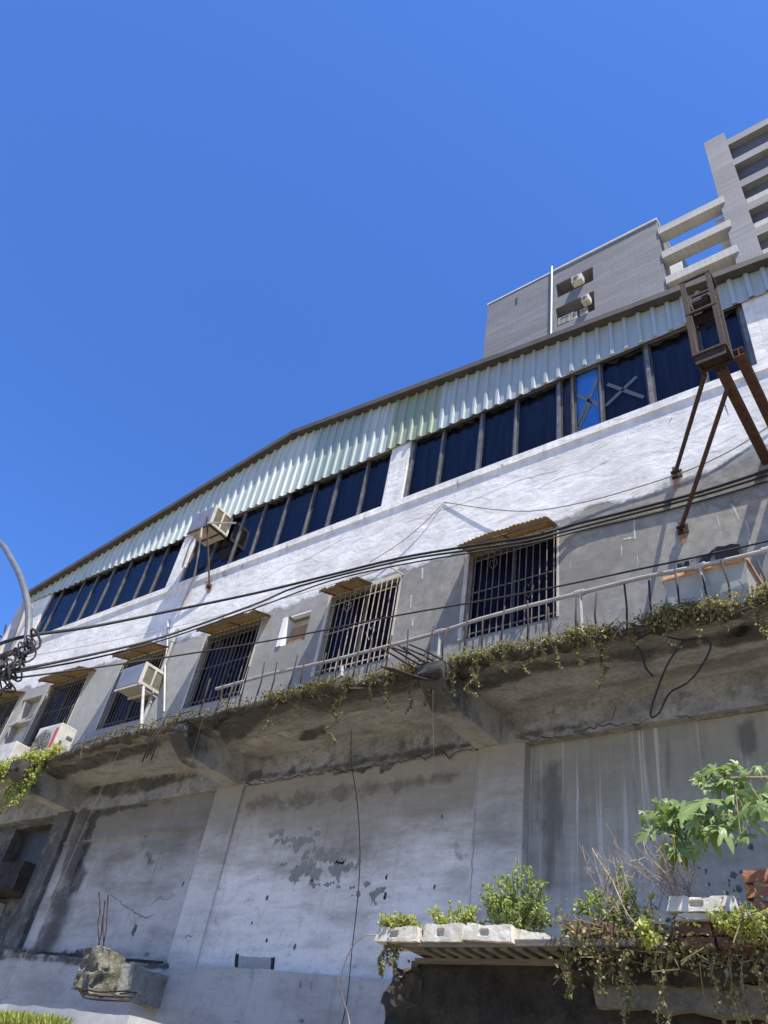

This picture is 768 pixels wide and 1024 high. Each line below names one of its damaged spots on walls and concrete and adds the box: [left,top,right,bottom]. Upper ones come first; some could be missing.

crack [517,709,697,742]
peeling [269,826,388,905]